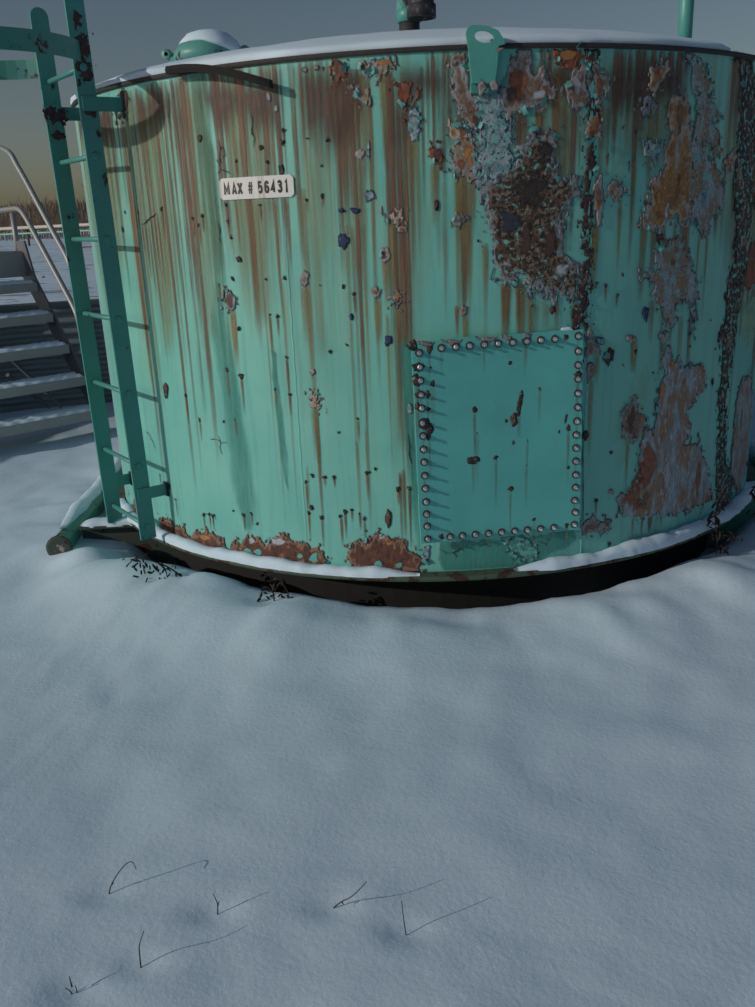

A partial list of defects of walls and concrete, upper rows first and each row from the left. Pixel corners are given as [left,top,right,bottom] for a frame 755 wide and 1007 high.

corrosion [69,10,96,87]
corrosion [42,53,465,420]
peeling [405,49,638,441]
peeling [565,52,755,547]
corrosion [157,513,332,564]
corrosion [344,468,426,572]